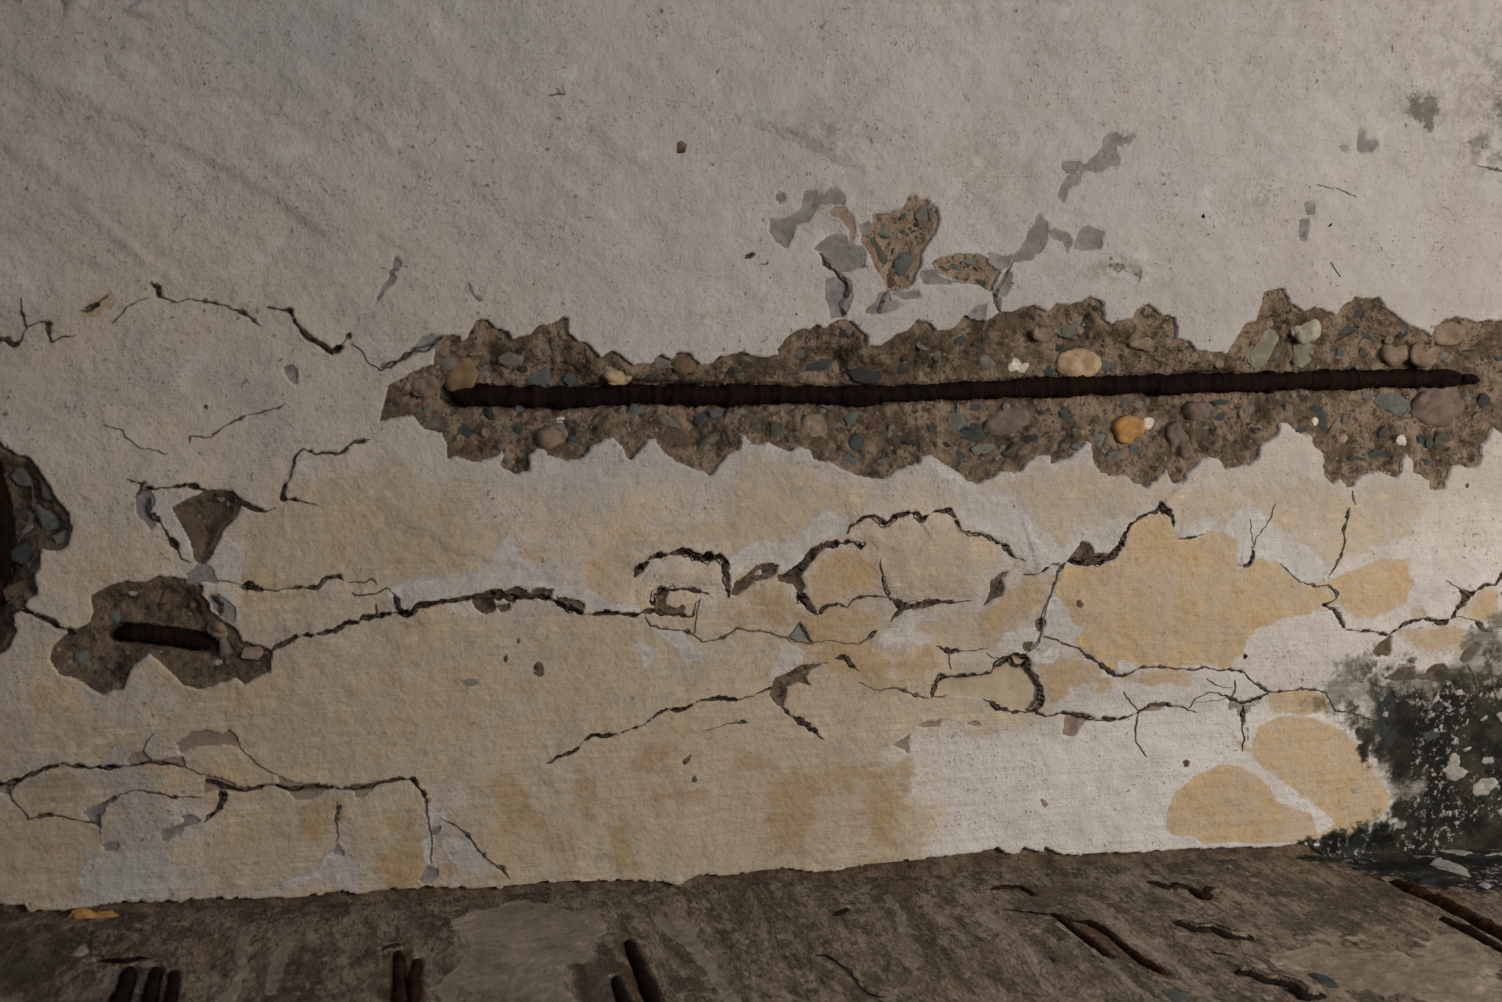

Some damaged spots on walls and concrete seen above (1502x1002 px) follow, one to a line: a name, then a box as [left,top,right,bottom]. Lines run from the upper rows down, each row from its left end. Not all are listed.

peeling [1058,132,1135,202]
crack [0,282,444,371]
crack [820,253,888,316]
spalling [380,188,1502,606]
crack [995,262,1013,313]
spalling [0,442,72,654]
crack [3,609,81,635]
spalling [50,488,272,695]
crack [104,404,1378,764]
crack [1243,490,1502,636]
crack [0,734,511,879]
water stain [1167,590,1502,894]